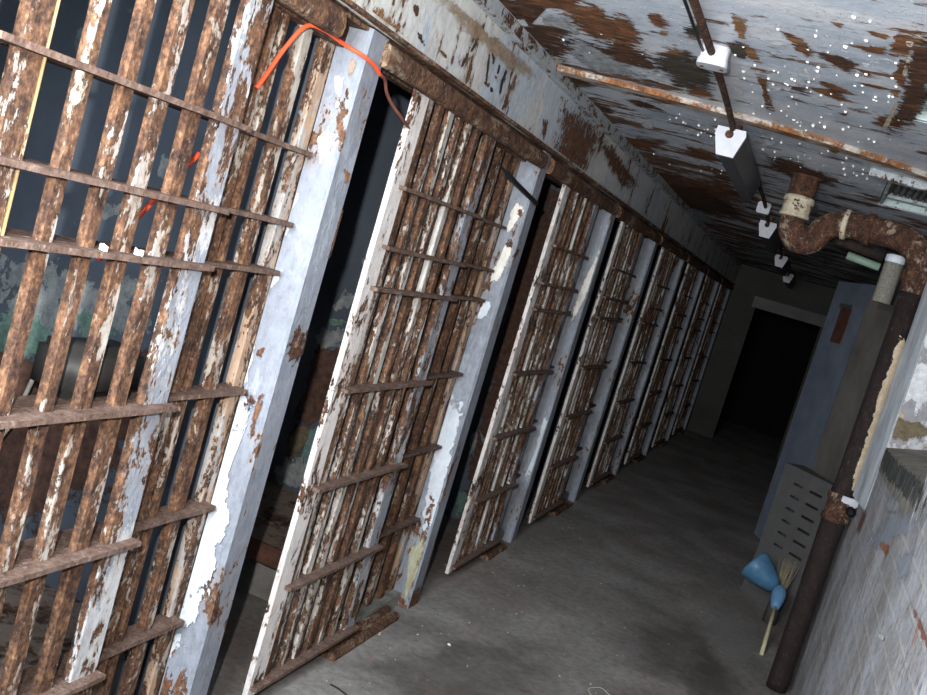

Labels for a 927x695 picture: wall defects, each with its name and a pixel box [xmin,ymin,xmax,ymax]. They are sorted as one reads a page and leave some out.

peeling [541,16,649,79]
rust [780,23,927,137]
rust [241,385,264,439]
peeling [315,288,355,349]
rust [456,180,562,520]
peeling [903,337,927,442]
rust [0,427,29,524]
rust [25,423,65,537]
rust [67,419,101,517]
peeling [169,345,255,658]
peeling [274,457,307,488]
flaking render [881,449,927,520]